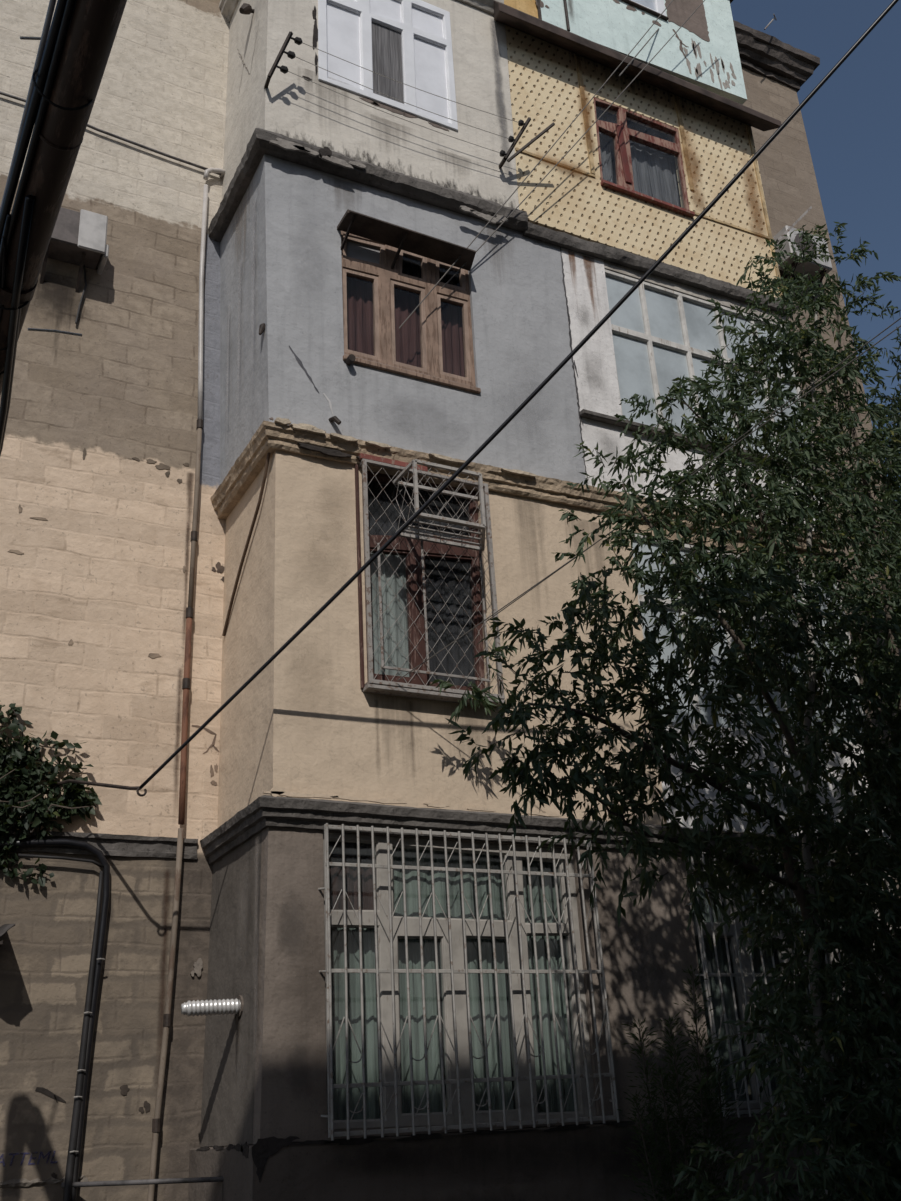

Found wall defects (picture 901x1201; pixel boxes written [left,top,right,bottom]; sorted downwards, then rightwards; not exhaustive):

peeling [613,0,737,90]
spalling [132,457,189,483]
spalling [197,1134,443,1182]